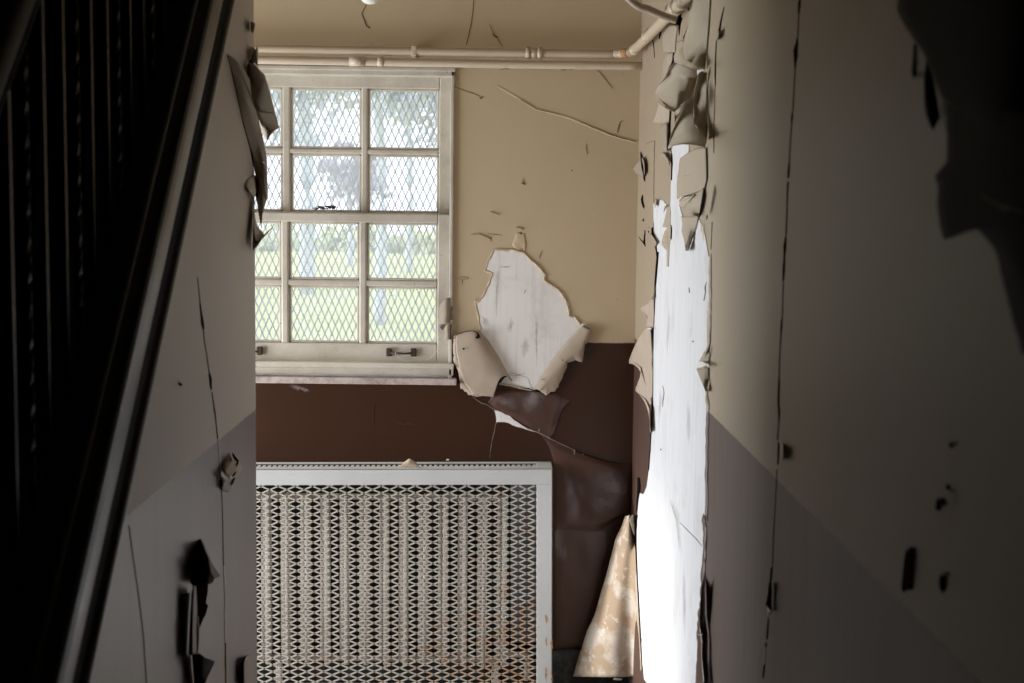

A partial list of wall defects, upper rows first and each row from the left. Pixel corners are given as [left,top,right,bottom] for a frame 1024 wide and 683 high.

peeling [227,46,279,251]
crack [454,85,655,196]
crack [639,222,657,257]
peeling [439,249,592,397]
peeling [573,0,712,683]
crack [762,0,801,678]
crack [197,277,226,683]
peeling [220,452,243,492]
peeling [906,547,914,590]